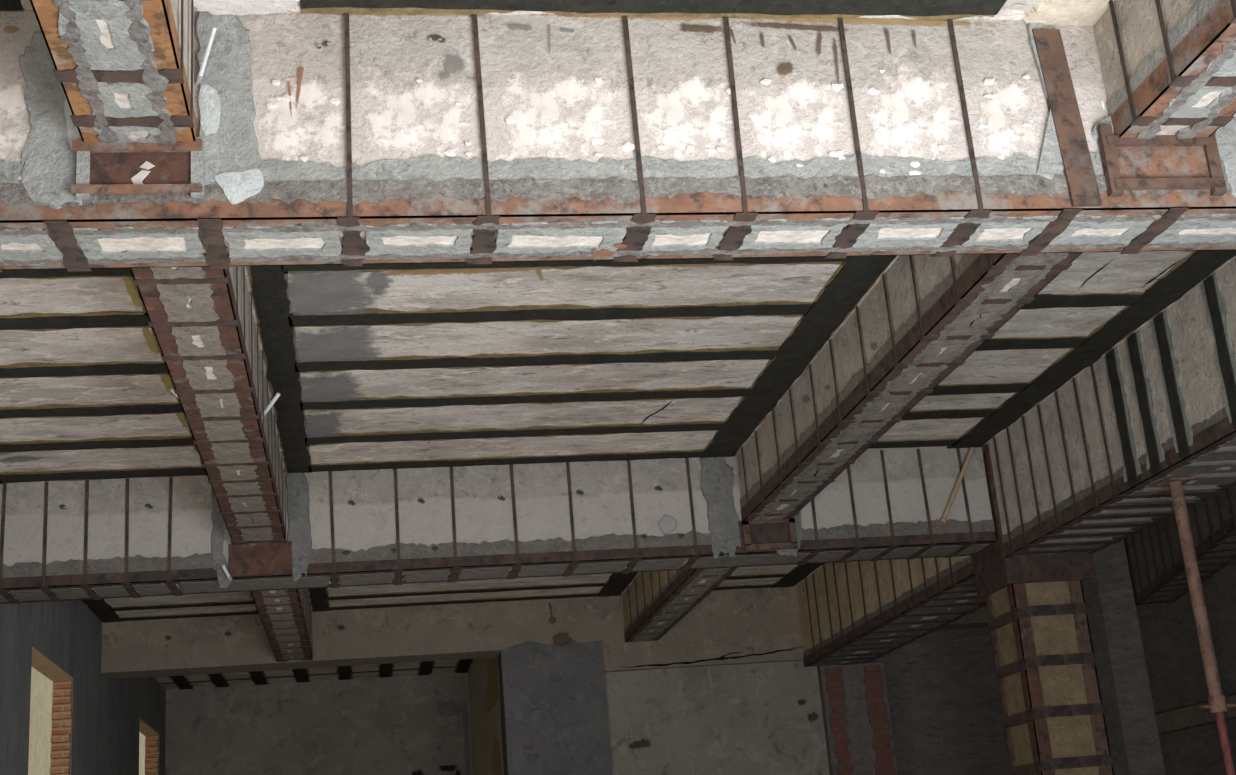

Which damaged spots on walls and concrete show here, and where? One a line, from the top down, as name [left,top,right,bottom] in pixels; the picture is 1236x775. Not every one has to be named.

rust [288,65,304,114]
leakage [439,54,465,79]
rust [749,18,996,83]
leakage [286,270,393,438]